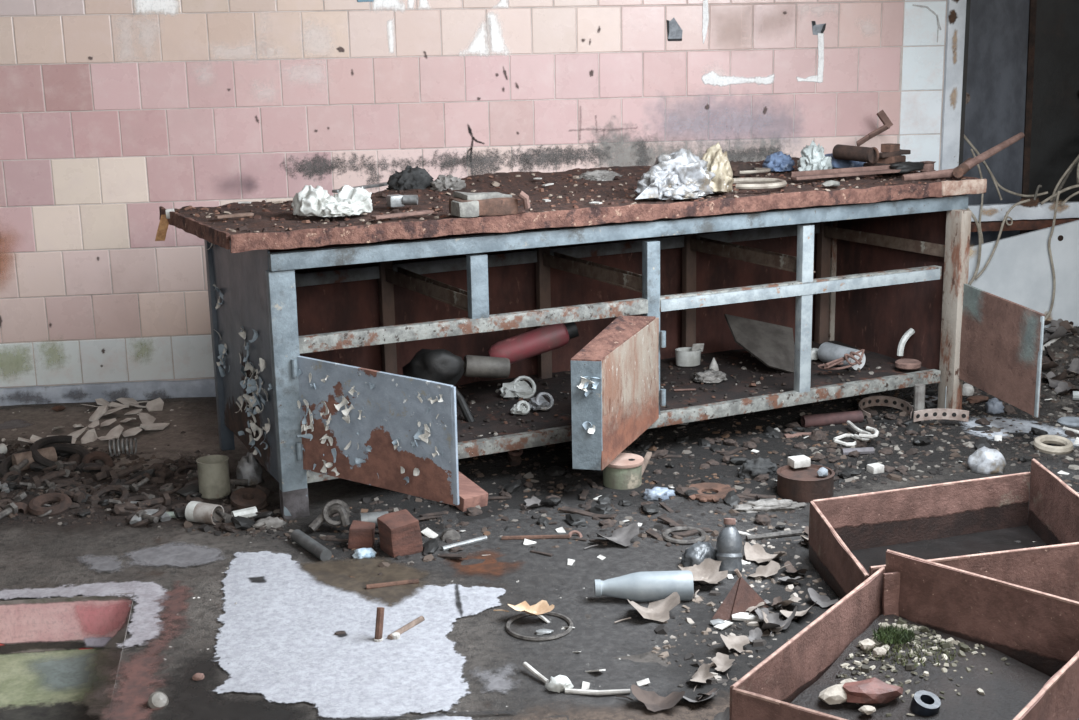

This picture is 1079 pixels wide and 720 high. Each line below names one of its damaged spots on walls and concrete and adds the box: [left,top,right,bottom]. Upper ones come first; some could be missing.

peeling [135,0,179,14]
peeling [357,0,429,53]
peeling [460,0,509,55]
spalling [812,21,826,35]
damp [283,130,704,184]
damp [727,141,780,162]